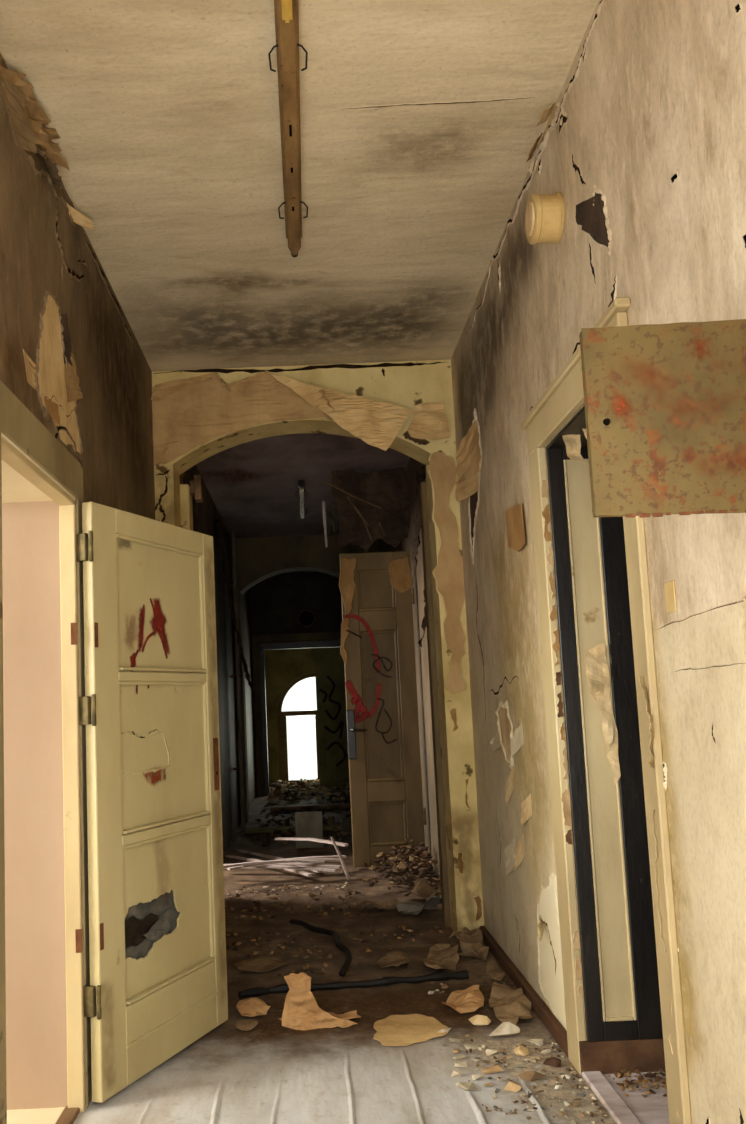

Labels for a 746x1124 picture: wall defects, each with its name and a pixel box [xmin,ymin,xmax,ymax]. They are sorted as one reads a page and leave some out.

crack [344,97,534,109]
crack [467,0,605,335]
crack [53,198,447,377]
flaking render [23,290,83,459]
crack [53,426,84,468]
peeling [427,450,468,732]
crack [738,1108,746,1124]